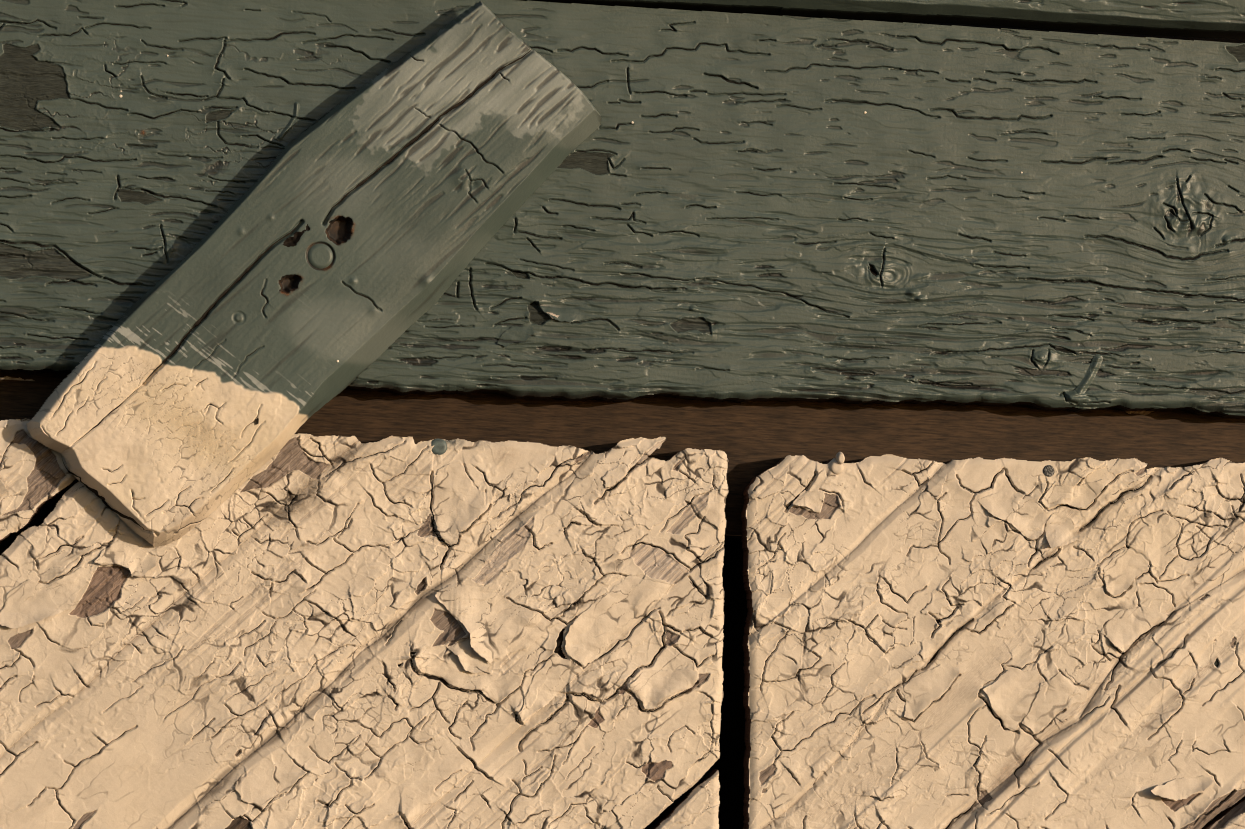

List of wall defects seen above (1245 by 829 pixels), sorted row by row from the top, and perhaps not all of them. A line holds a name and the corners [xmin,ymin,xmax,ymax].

peeling [0,44,70,132]
crack [424,23,1245,379]
crack [912,315,1242,394]
crack [0,0,724,829]
peeling [0,533,157,649]
peeling [398,517,671,722]
peeling [665,630,680,646]
crack [760,465,1245,829]
peeling [1151,775,1245,829]